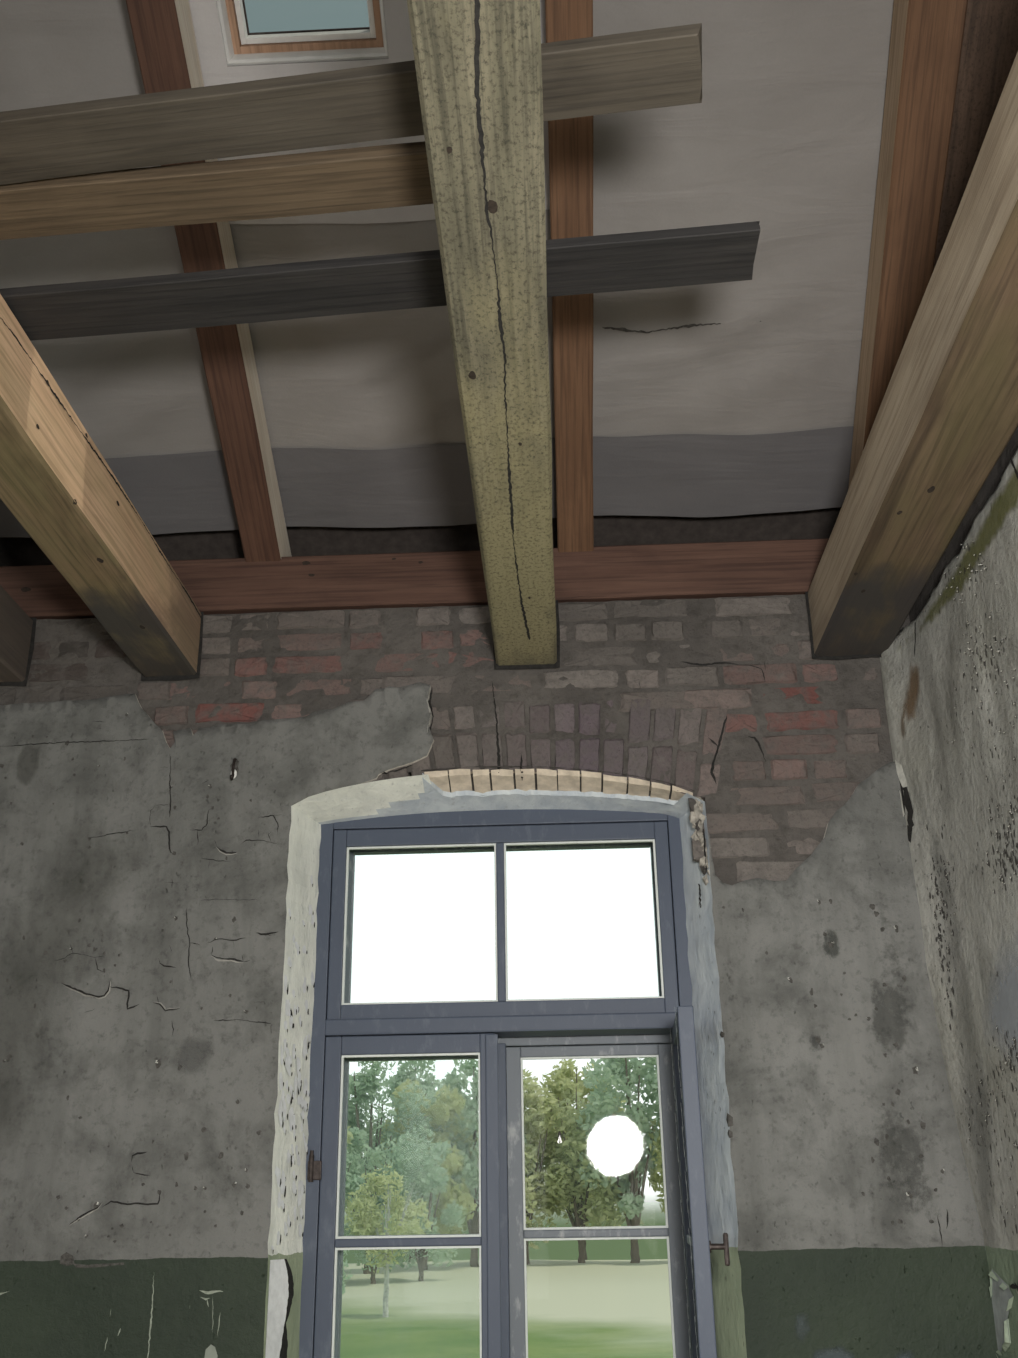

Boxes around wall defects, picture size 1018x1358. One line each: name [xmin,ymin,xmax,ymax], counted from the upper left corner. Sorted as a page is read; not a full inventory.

crack [474,0,530,640]
crack [13,721,279,1035]
flaking render [0,608,389,748]
flaking render [422,594,957,1030]
flaking render [939,541,1018,894]
crack [69,1152,161,1225]
flaking render [714,1089,733,1138]
flaking render [960,1026,1018,1234]
peeling [988,1269,1014,1358]